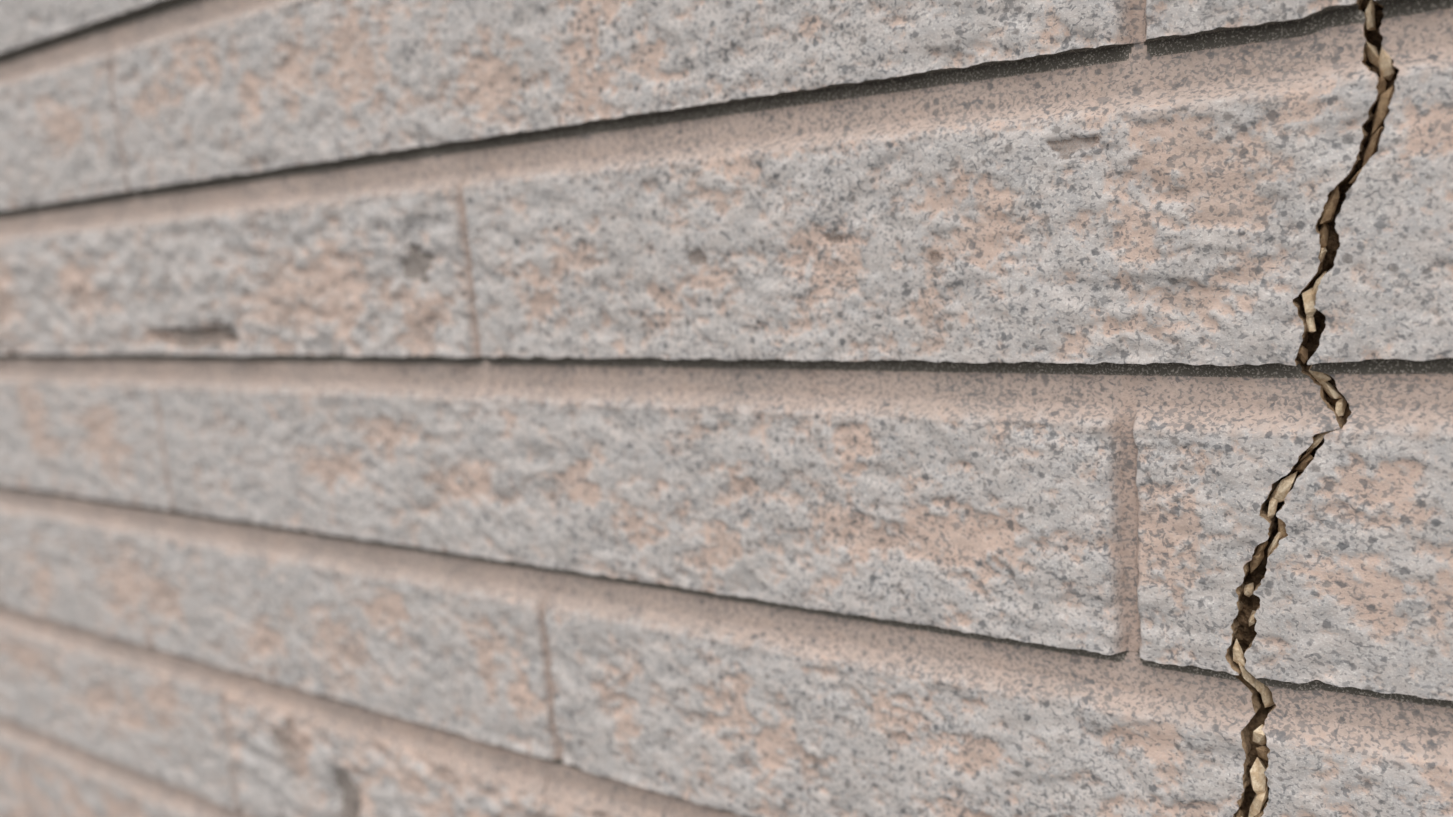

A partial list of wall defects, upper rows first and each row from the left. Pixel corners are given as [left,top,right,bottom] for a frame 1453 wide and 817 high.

crack [1225,0,1400,817]